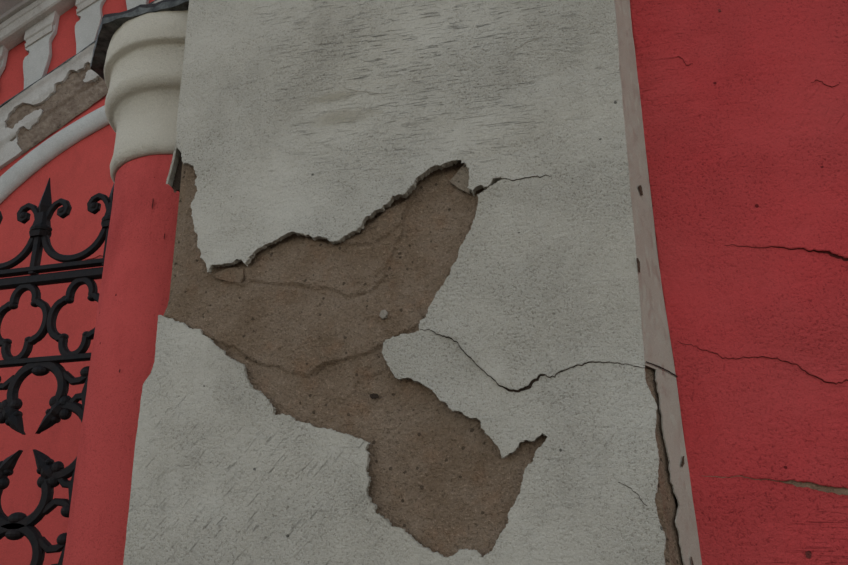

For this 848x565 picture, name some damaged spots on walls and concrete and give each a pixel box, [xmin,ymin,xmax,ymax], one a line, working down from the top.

flaking render [6,63,108,155]
crack [725,224,848,261]
spalling [163,141,547,557]
crack [420,316,678,392]
spalling [645,366,684,565]